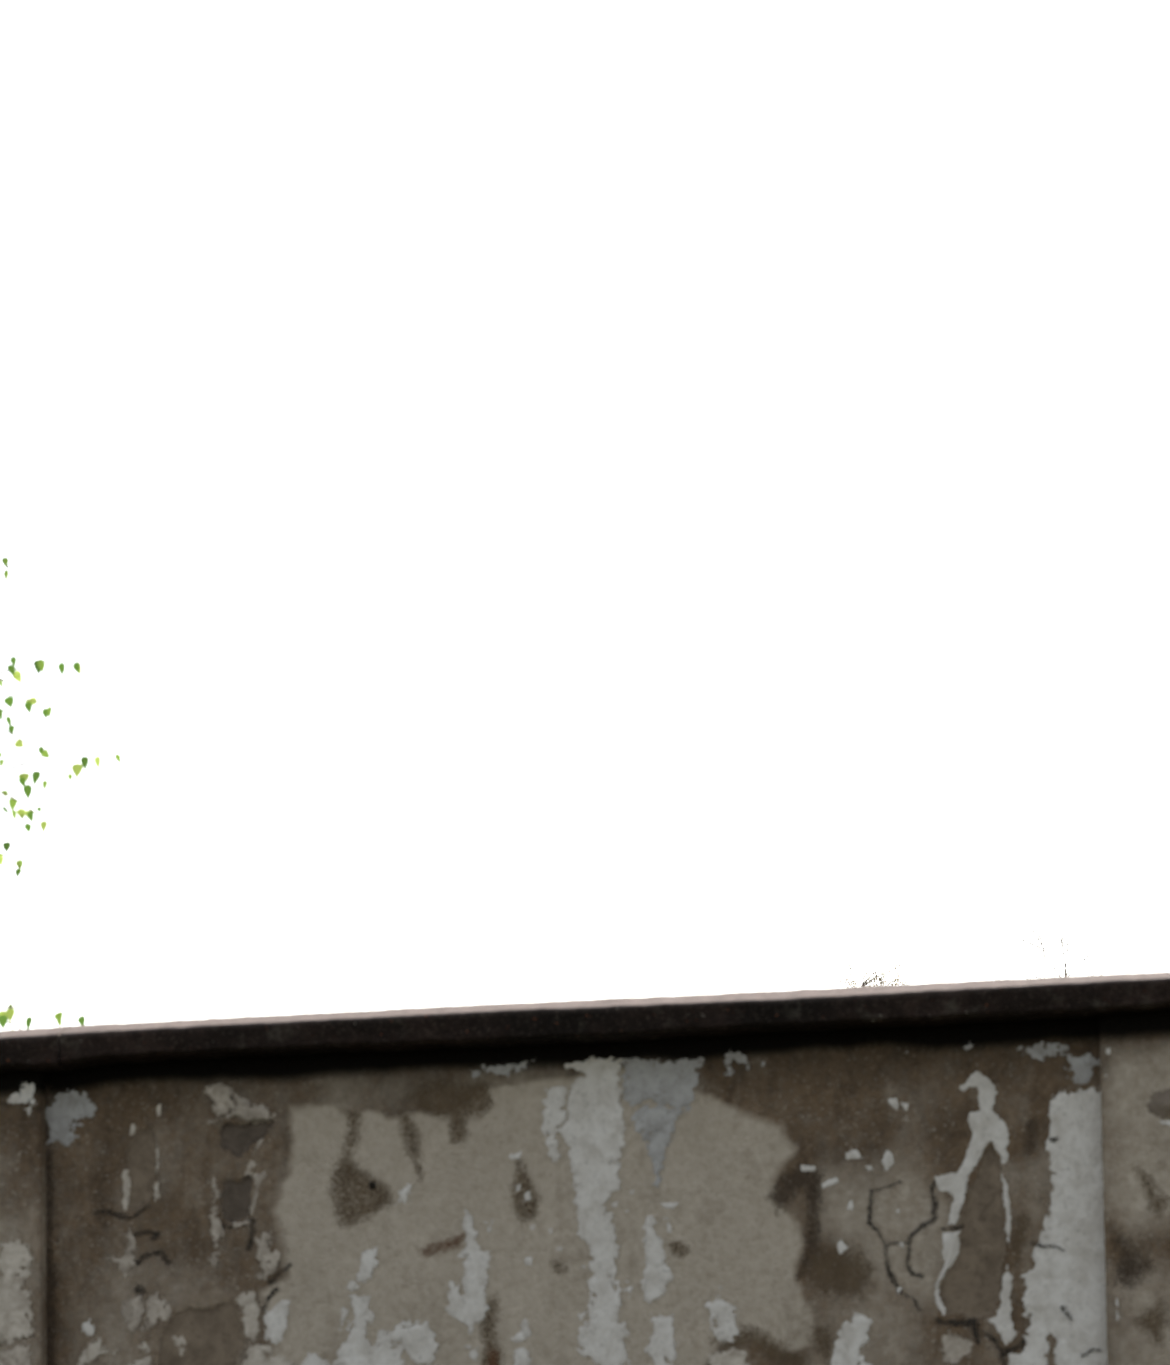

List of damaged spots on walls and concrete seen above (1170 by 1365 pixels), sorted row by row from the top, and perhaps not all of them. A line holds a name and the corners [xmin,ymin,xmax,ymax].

peeling [0,1239,35,1365]
peeling [7,1082,97,1147]
peeling [77,1169,172,1365]
peeling [203,1081,438,1365]
damp [325,1106,395,1230]
peeling [541,1056,704,1365]
peeling [701,1285,750,1365]
peeling [724,1049,765,1076]
damp [765,1161,881,1301]
peeling [830,1310,873,1365]
crack [866,1180,1026,1365]
peeling [934,1041,1119,1365]